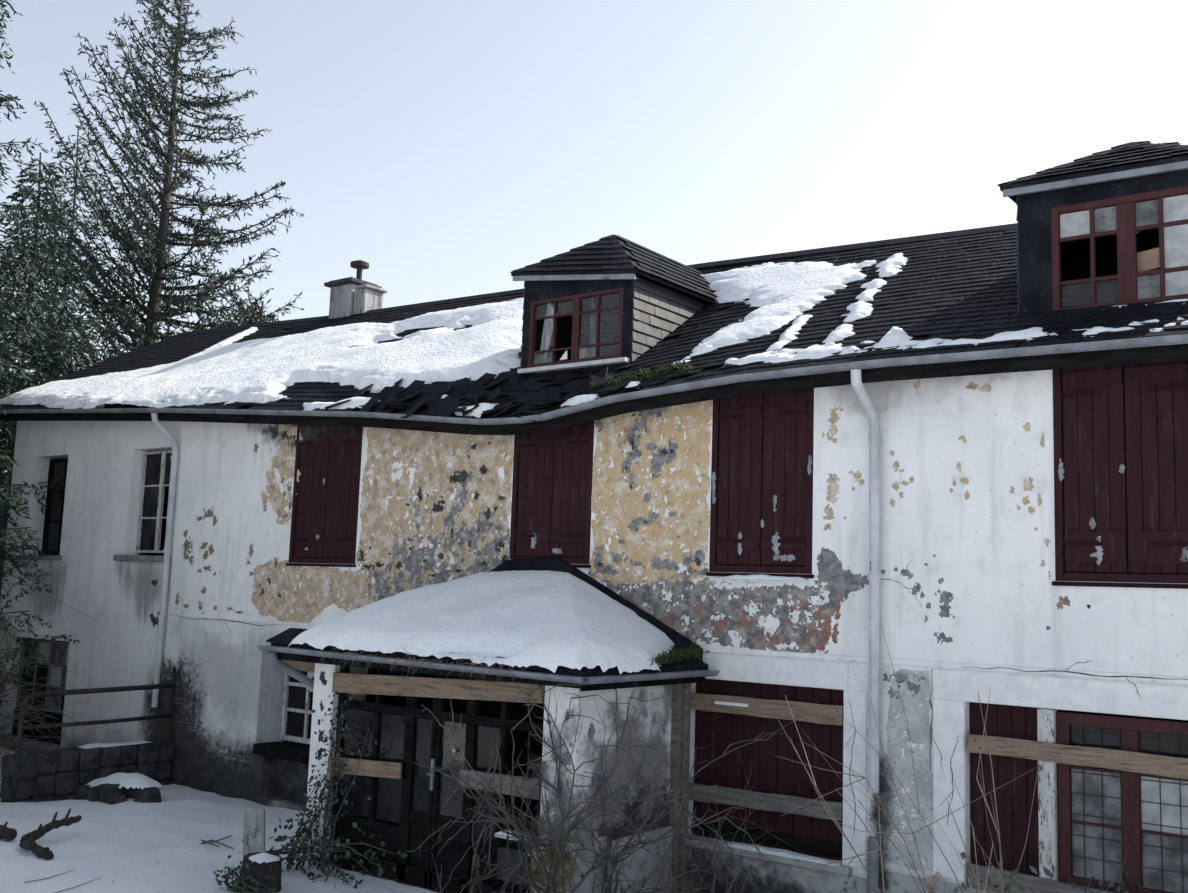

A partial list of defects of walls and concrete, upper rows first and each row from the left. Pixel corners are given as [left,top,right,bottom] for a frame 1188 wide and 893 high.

flaking render [175,424,514,626]
flaking render [588,400,869,653]
leakage [142,658,273,806]